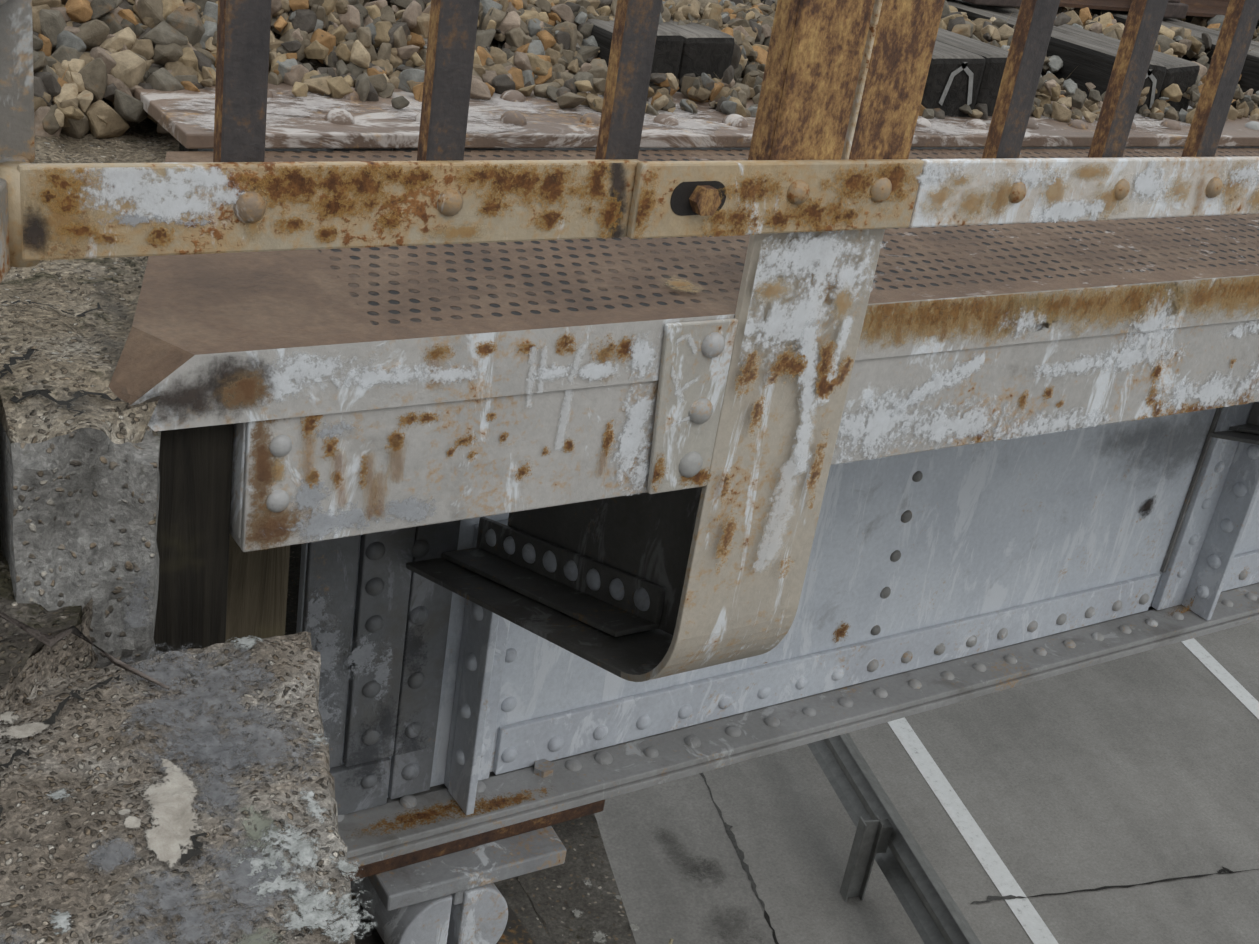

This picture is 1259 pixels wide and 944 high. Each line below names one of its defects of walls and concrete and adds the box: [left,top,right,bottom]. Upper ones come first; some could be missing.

rust [27,168,123,256]
rust [238,165,435,242]
rust [431,163,658,240]
rust [702,162,916,237]
crack [0,349,120,417]
rust [556,333,636,364]
rust [735,340,854,434]
rust [245,419,313,550]
rust [301,415,368,489]
rust [385,412,438,451]
spalling [116,758,203,869]
rust [351,788,548,836]